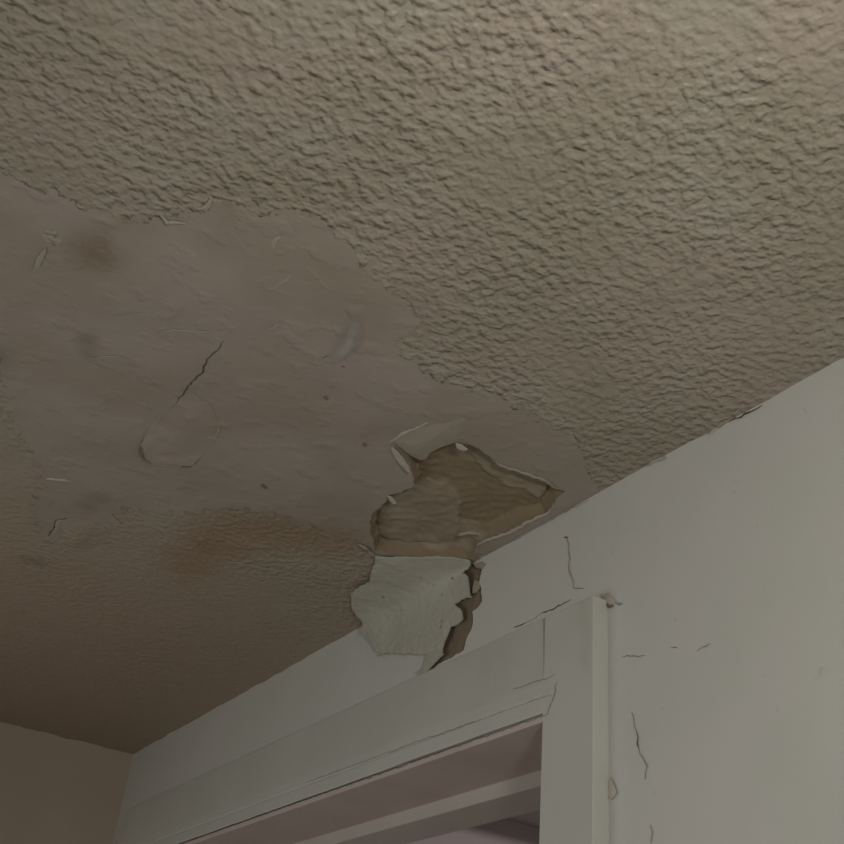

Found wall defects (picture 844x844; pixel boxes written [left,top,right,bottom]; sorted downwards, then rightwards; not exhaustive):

crack [155,345,221,430]
peeling [0,167,602,676]
crack [707,405,762,436]
crack [514,536,584,628]
crack [632,713,647,780]